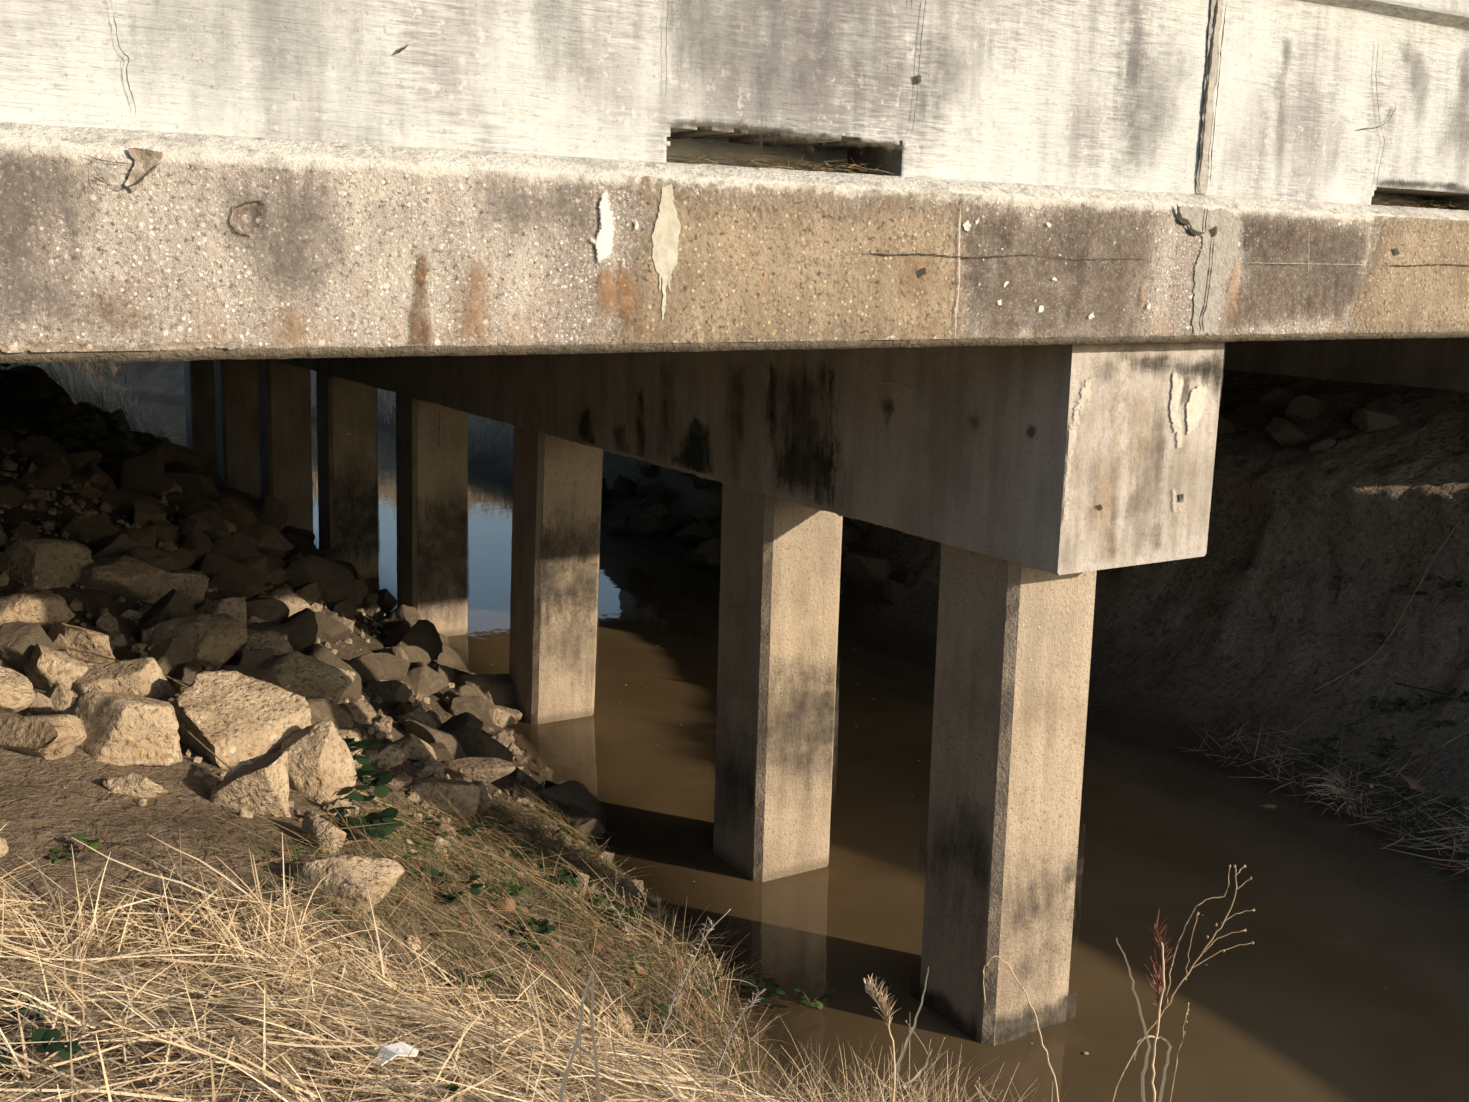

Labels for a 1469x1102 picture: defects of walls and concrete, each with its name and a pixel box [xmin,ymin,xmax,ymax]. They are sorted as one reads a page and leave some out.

crack [110,0,136,118]
spalling [84,148,164,193]
crack [1176,0,1227,331]
rust [410,256,431,344]
peeling [591,176,984,344]
crack [1382,261,1469,269]
water stain [768,366,838,497]
water stain [767,670,839,768]
water stain [909,981,977,1039]
water stain [997,994,1077,1045]